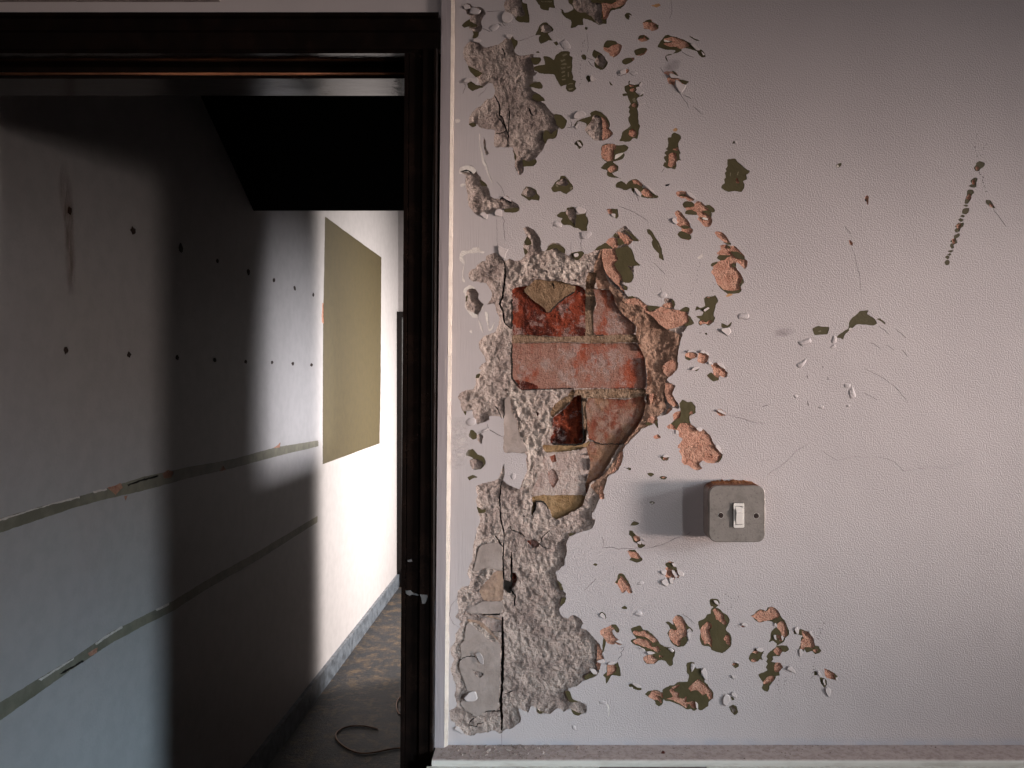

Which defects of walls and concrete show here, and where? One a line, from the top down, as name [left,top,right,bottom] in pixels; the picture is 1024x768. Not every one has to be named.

peeling [944,161,985,265]
flaking render [449,0,821,736]
peeling [812,310,885,340]
peeling [814,668,839,697]